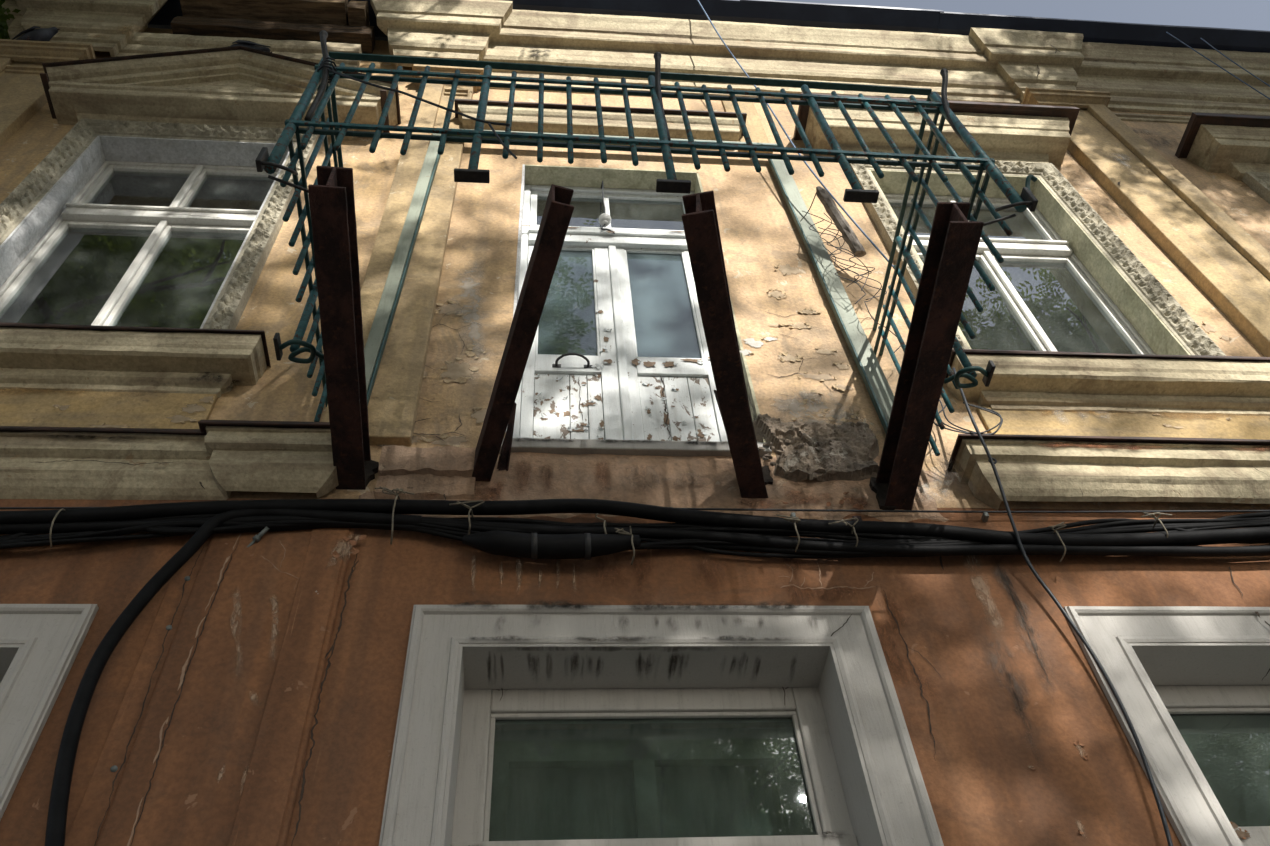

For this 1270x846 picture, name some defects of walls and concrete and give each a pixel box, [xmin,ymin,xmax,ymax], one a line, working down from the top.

peeling [533,328,612,440]
peeling [632,357,710,367]
peeling [643,382,707,441]
spalling [740,308,896,510]
crack [291,554,359,846]
damp [571,637,649,670]
crack [779,563,942,761]
damp [965,555,1046,670]
crack [1229,566,1270,626]